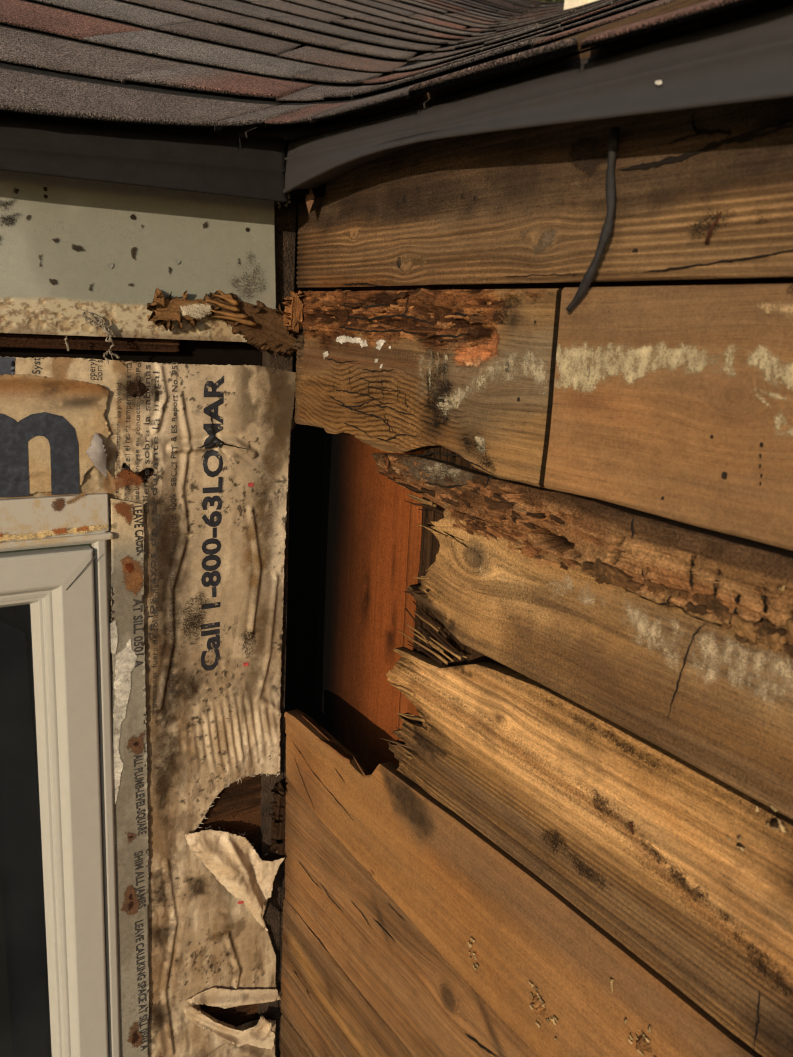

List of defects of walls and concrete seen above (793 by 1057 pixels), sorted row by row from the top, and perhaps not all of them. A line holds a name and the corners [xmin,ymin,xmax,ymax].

crack [620,114,793,171]
leakage [0,188,31,239]
peeling [180,304,211,319]
peeling [308,289,415,368]
peeling [427,293,492,367]
leakage [245,390,284,589]
leakage [160,514,209,669]
peeling [384,455,793,656]
crack [625,531,767,721]
leakage [155,700,196,796]